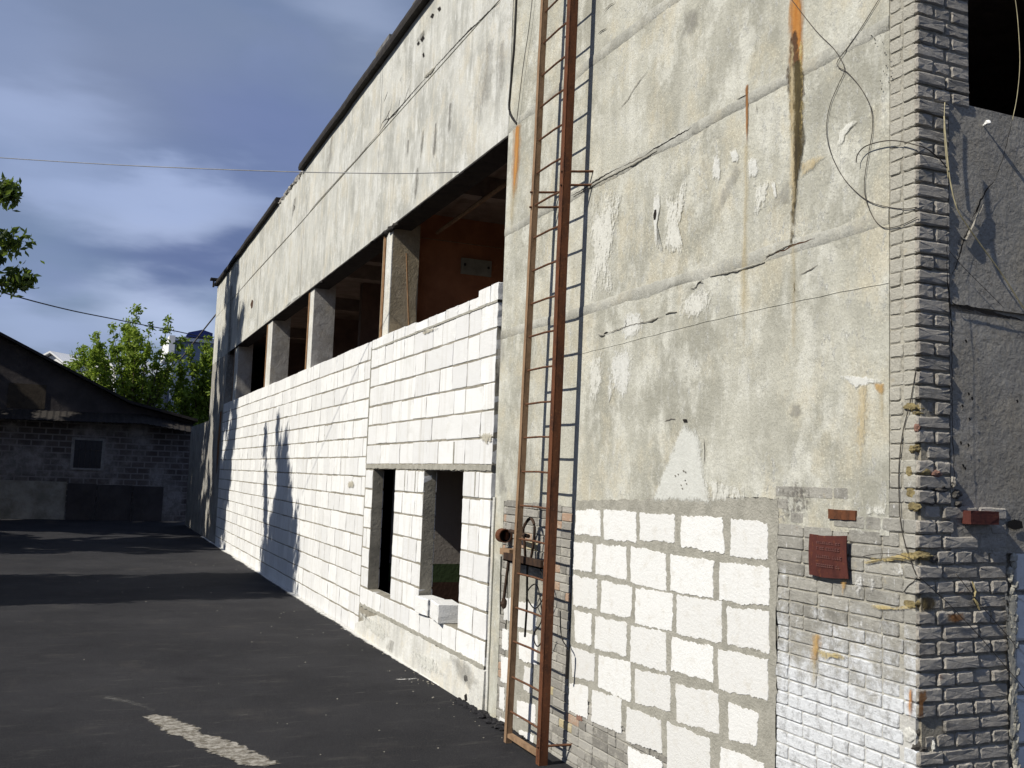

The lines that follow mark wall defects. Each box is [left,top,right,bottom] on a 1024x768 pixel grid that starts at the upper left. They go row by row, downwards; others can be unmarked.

corrosion [786,0,805,243]
crack [571,128,690,197]
flaking render [713,150,776,212]
flaking render [652,183,686,252]
crack [766,239,818,293]
crack [598,311,676,337]
corrosion [812,634,844,661]